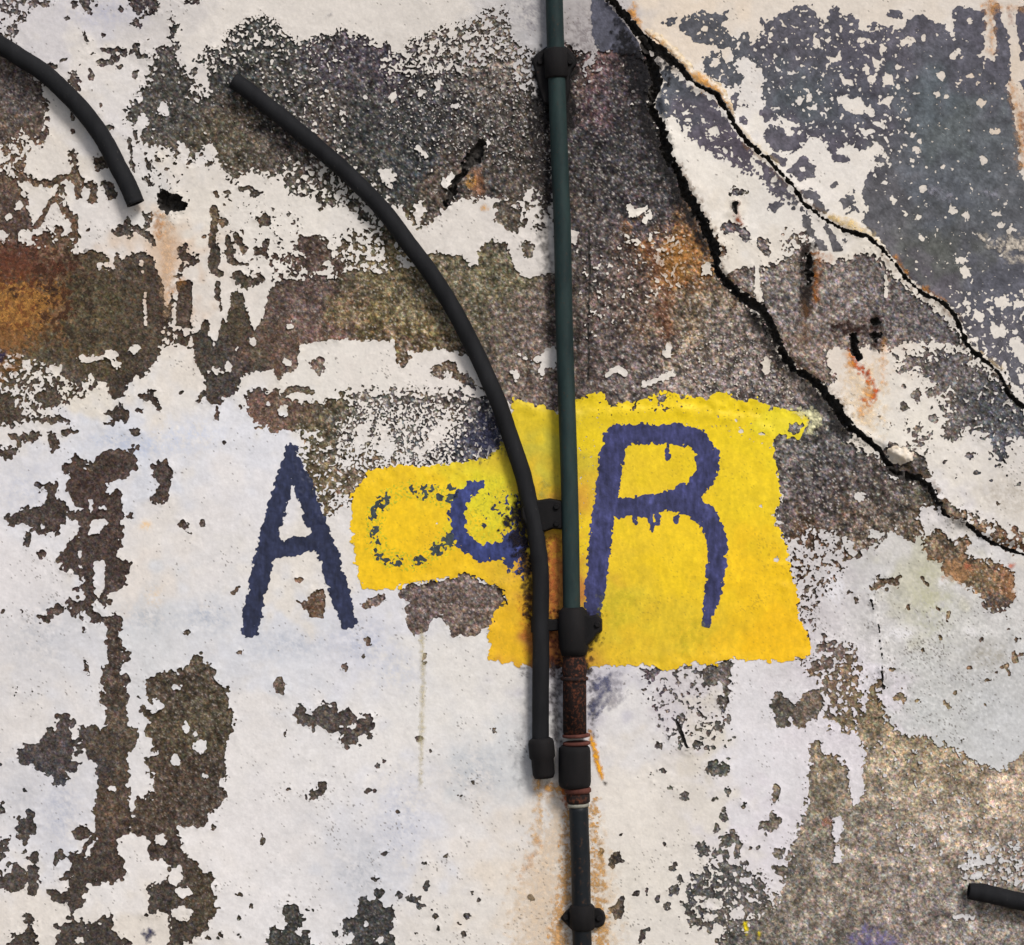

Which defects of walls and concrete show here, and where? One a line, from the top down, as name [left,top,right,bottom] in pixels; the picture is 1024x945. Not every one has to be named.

peeling [867,9,903,31]
peeling [1016,6,1024,61]
rust [0,246,96,347]
crack [605,0,1024,556]
rust [831,314,881,350]
rust [848,350,878,402]
spalling [0,0,558,945]
spalling [564,42,1024,945]
rust [562,730,606,785]